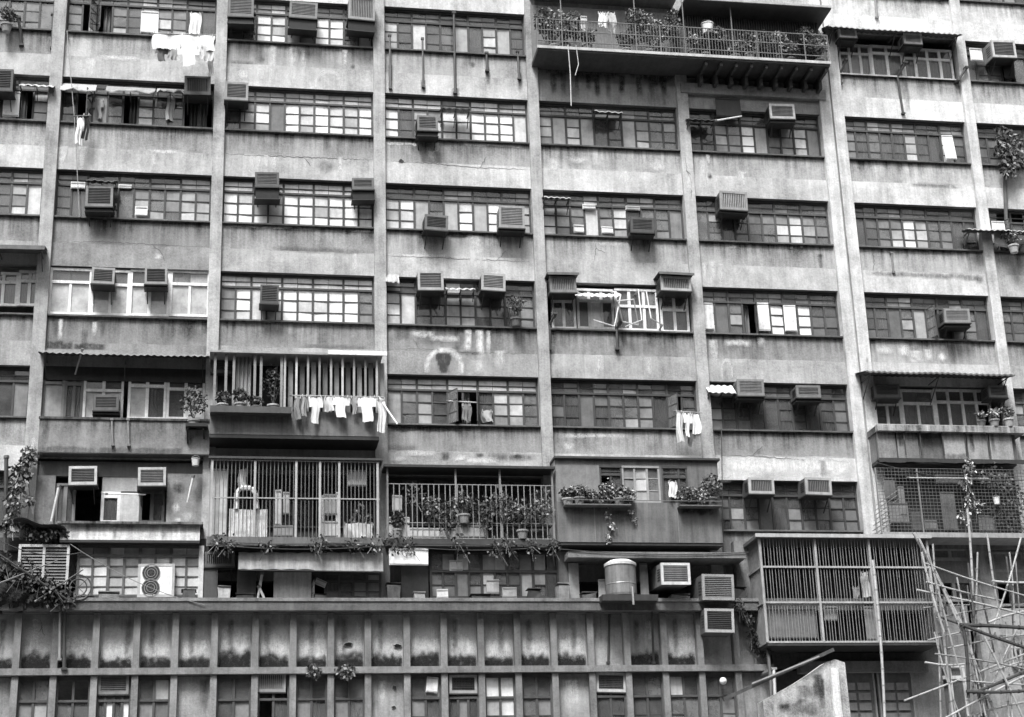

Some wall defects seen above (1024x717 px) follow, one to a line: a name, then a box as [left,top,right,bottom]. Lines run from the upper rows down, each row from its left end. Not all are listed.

water stain [0,632,585,669]
water stain [631,639,695,665]